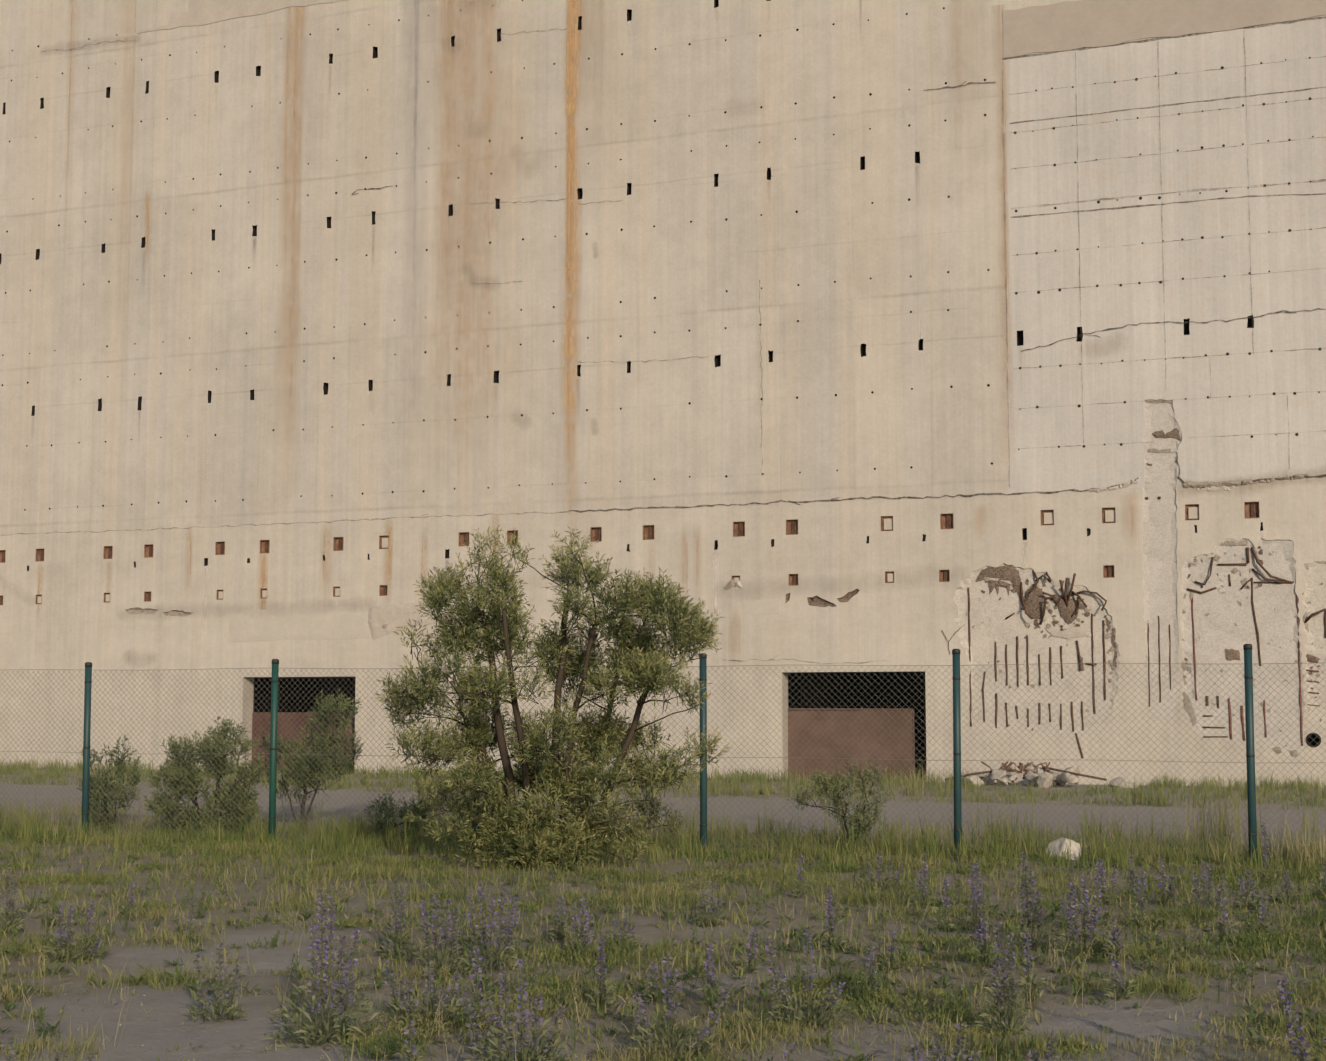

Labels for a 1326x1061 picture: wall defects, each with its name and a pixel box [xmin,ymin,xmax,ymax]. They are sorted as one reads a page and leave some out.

rust [565,0,580,409]
crack [1021,308,1324,352]
spalling [1146,428,1181,466]
spalling [953,563,1120,759]
spalling [1147,538,1326,757]